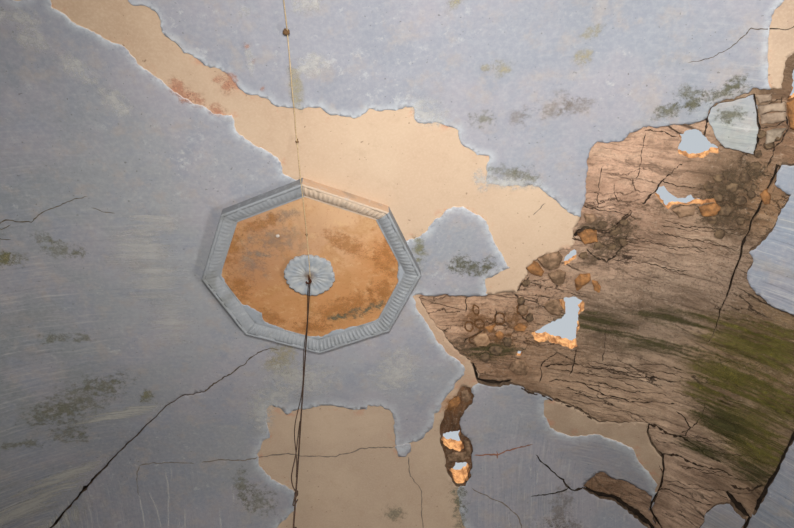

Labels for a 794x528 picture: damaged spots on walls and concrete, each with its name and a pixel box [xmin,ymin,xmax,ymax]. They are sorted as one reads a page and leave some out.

crack [688,26,794,63]
peeling [51,0,580,295]
crack [0,196,111,240]
damp [450,256,491,276]
spalling [257,0,794,528]
crack [204,348,279,392]
crack [49,443,127,528]
crack [136,447,424,527]
crack [472,423,665,528]